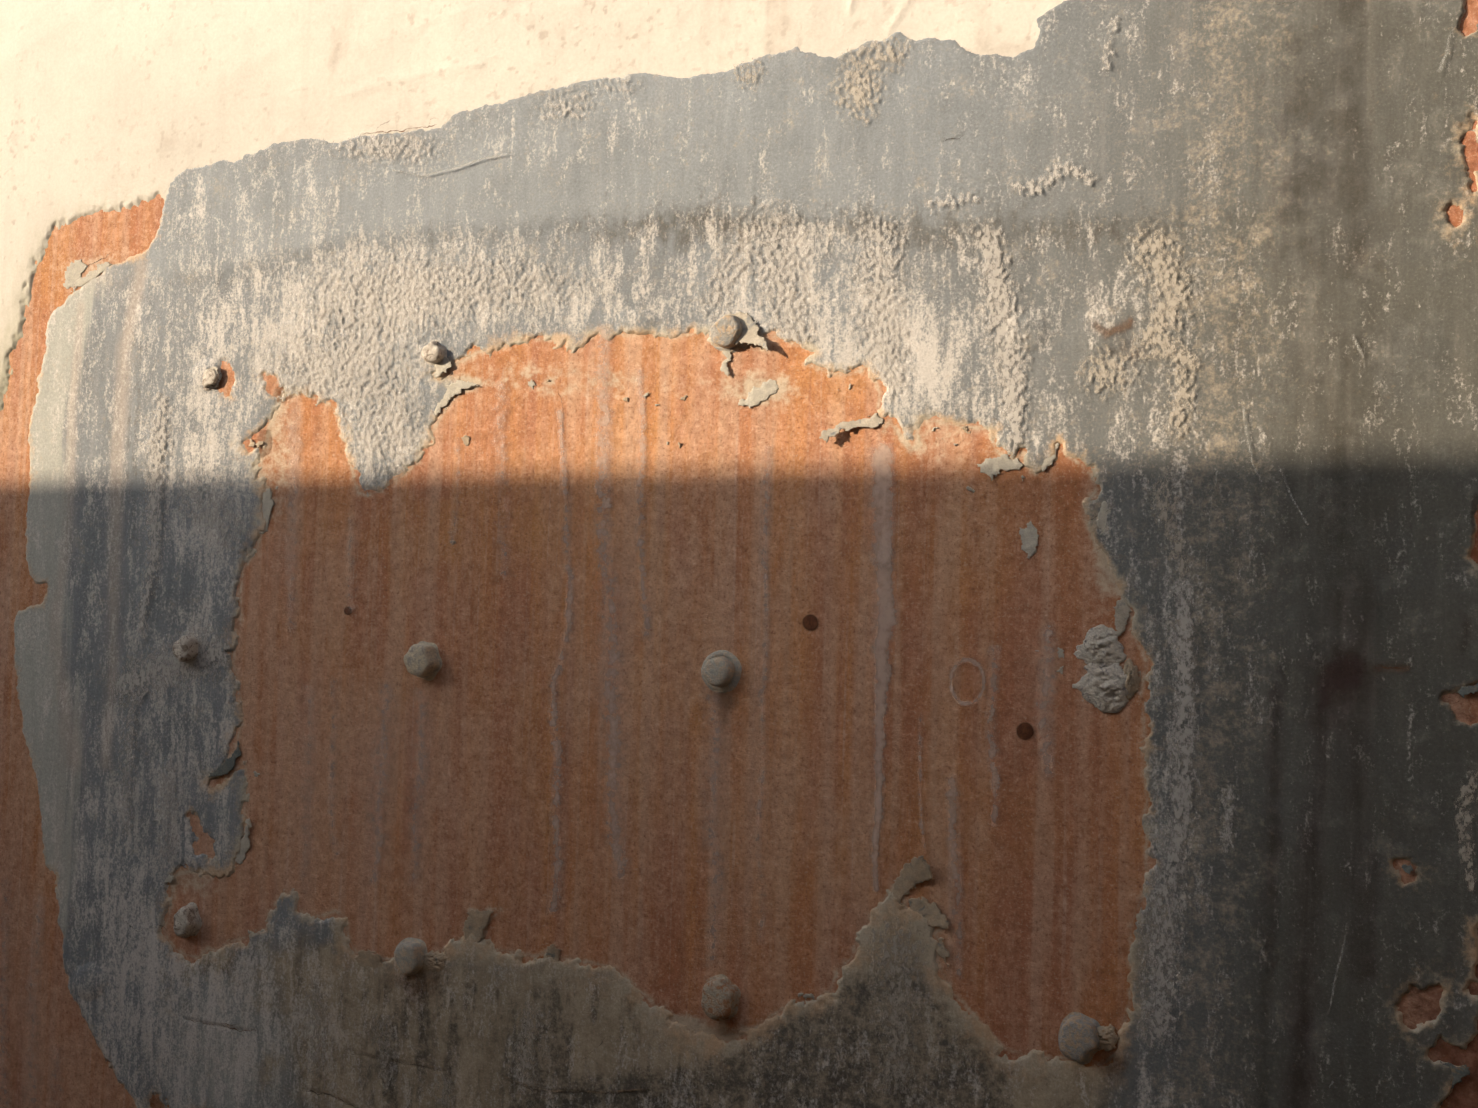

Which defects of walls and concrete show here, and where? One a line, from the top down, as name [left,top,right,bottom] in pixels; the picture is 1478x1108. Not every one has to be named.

corrosion [803,615,818,630]
peeling [161,312,1156,1068]
corrosion [1017,723,1034,740]